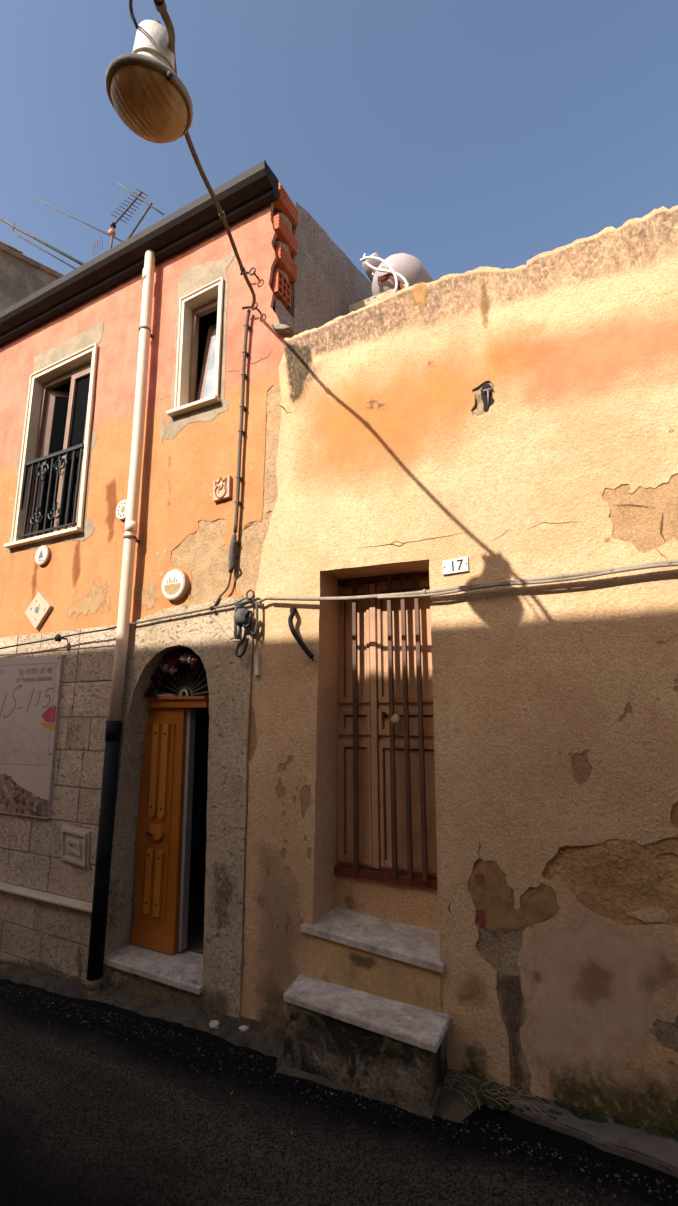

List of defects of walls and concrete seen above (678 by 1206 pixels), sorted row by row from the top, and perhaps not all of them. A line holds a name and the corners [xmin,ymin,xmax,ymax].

damp [284,209,678,402]
peeling [132,385,281,610]
peeling [602,473,678,553]
peeling [558,750,601,785]
peeling [467,801,678,1090]